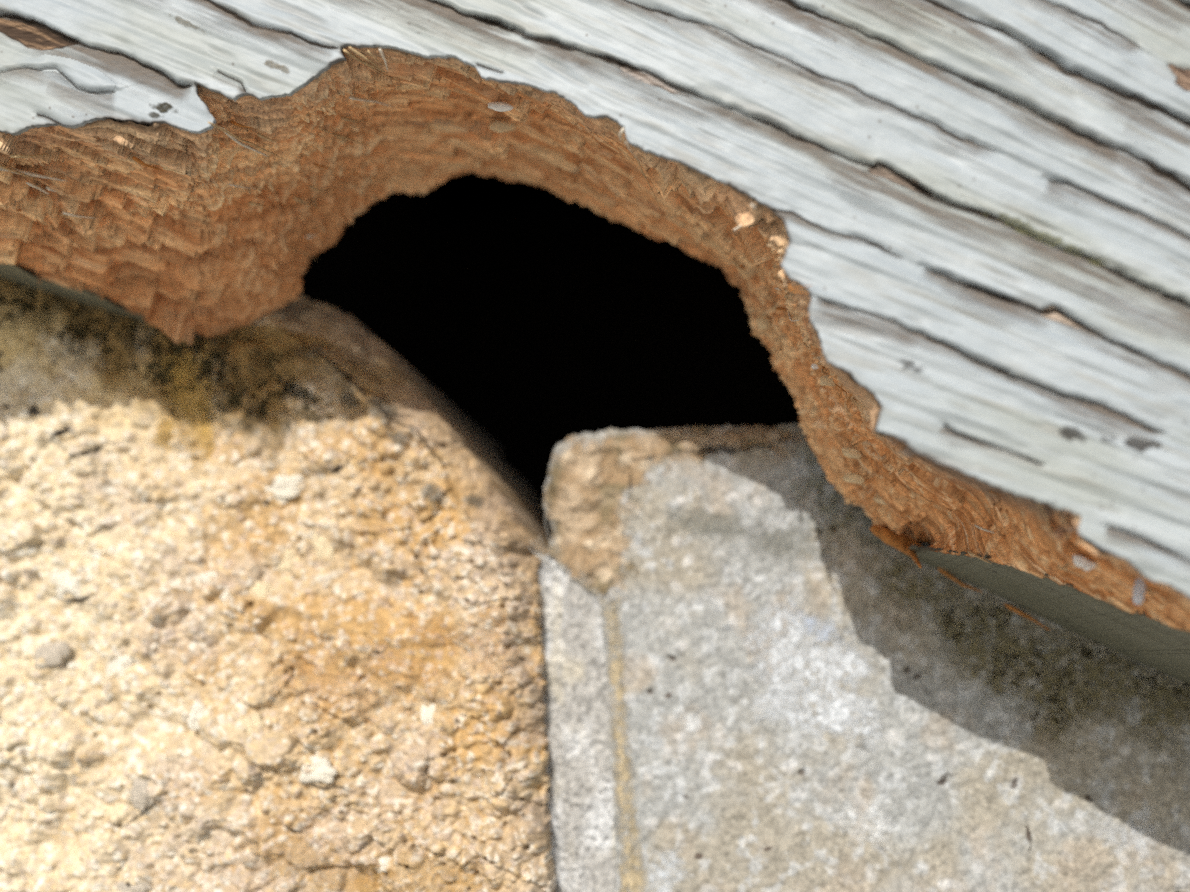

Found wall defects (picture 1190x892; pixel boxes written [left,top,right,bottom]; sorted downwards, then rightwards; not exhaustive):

peeling [619,66,687,96]
peeling [1168,64,1190,91]
crack [400,0,1190,321]
crack [929,273,1190,382]
peeling [1042,305,1082,328]
crack [818,298,1163,434]
crack [696,446,734,454]
crack [942,424,1043,465]
spalling [544,425,798,594]
crack [1108,528,1190,562]